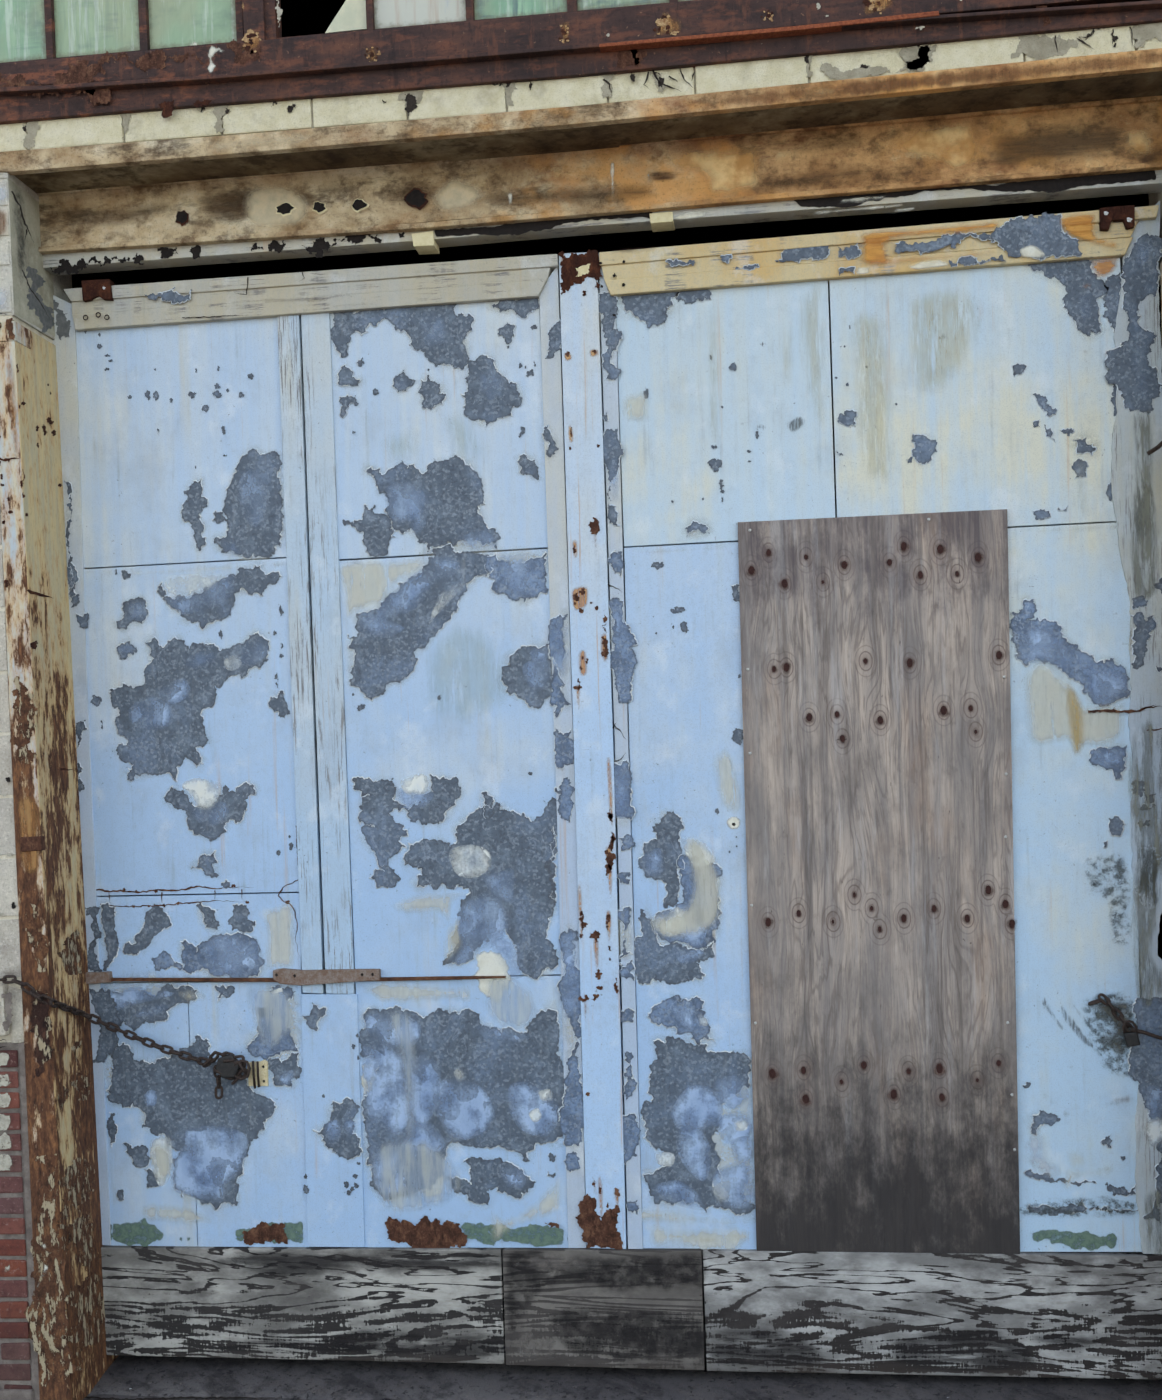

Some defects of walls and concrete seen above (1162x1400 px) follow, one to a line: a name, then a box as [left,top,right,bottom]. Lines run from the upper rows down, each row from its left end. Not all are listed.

crack [0,174,50,318]
peeling [794,170,1156,208]
peeling [895,212,1162,416]
peeling [342,455,549,711]
peeling [1009,577,1162,707]
rust [10,676,38,768]
peeling [75,448,327,1211]
peeling [312,614,584,1206]
rust [24,1154,106,1387]
rust [242,1221,288,1246]
rust [385,1216,467,1248]
rust [575,1180,623,1250]